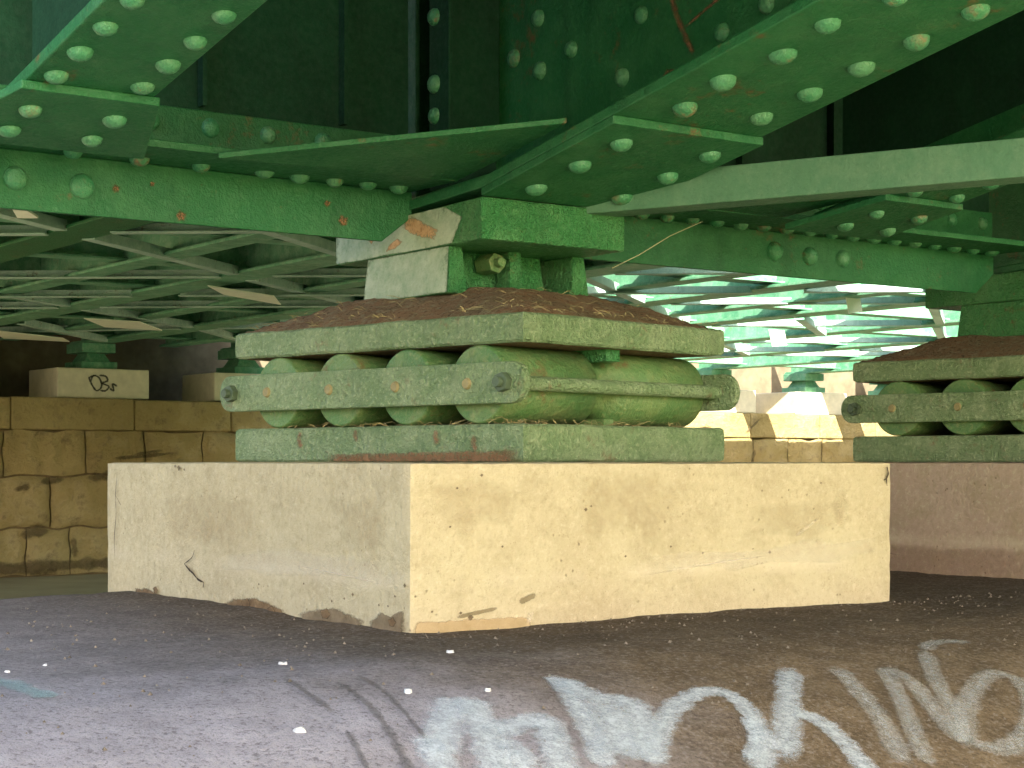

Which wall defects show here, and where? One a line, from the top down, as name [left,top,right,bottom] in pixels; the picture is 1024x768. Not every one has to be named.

corrosion [670,0,718,52]
peeling [336,207,461,300]
corrosion [332,431,514,461]